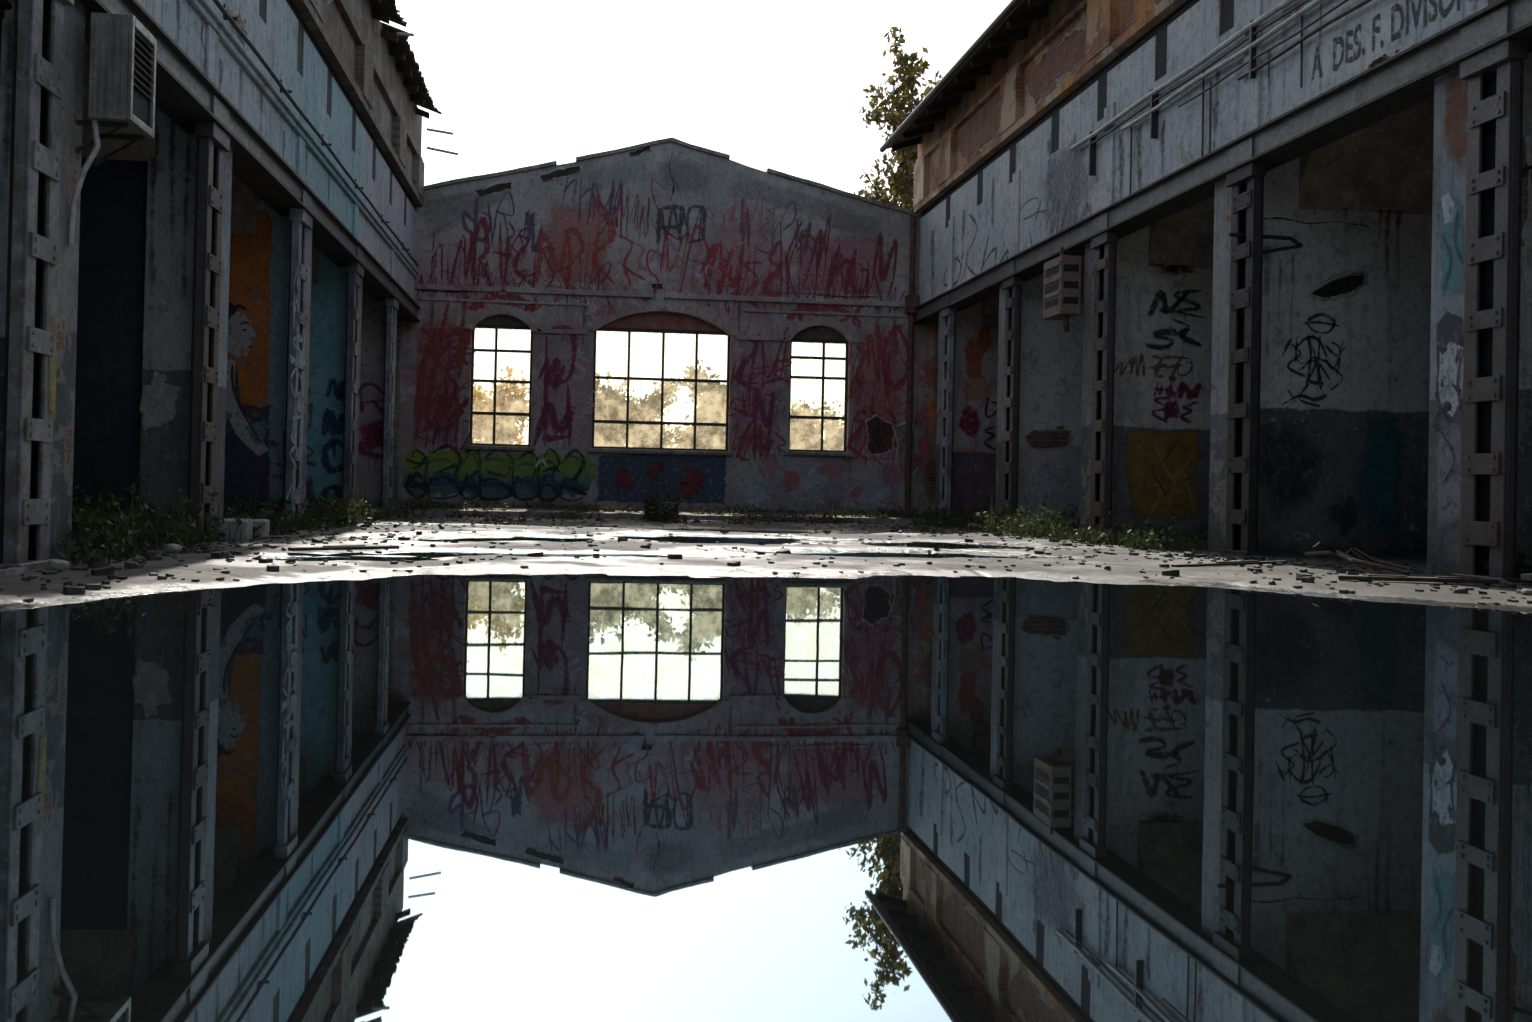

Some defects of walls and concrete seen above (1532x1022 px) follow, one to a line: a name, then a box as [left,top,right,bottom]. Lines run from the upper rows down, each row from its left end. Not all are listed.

spalling [1307,268,1369,302]
peeling [139,371,181,430]
peeling [862,407,920,483]